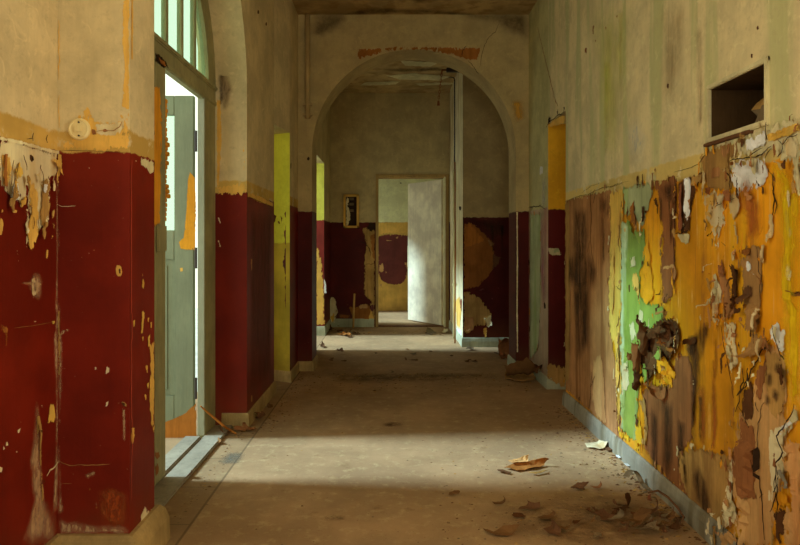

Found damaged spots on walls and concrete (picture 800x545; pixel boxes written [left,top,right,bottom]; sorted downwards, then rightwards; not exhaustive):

peeling [358,47,480,60]
peeling [0,0,133,249]
flaking render [360,61,501,338]
peeling [133,311,155,432]
peeling [317,222,408,327]
peeling [529,116,800,545]
flaking render [31,404,55,536]